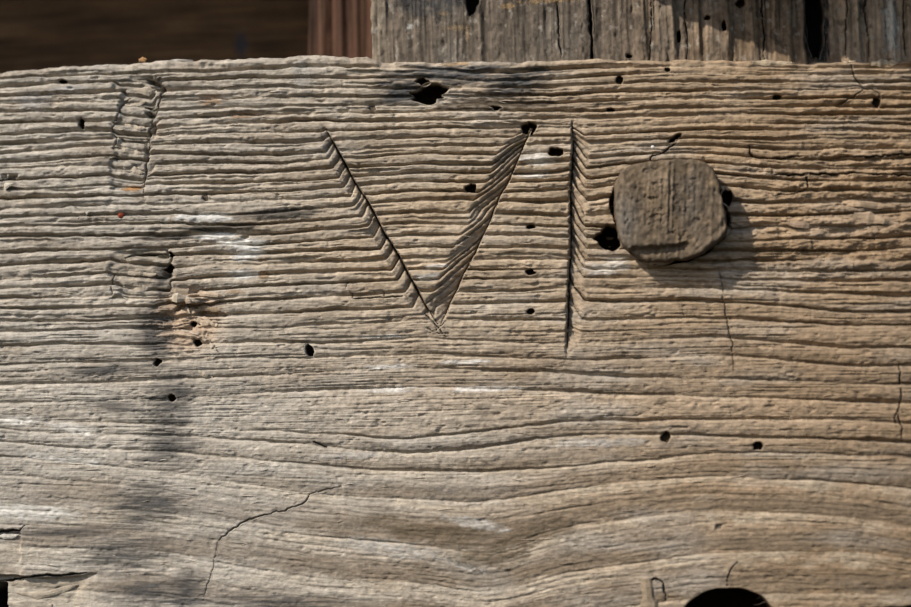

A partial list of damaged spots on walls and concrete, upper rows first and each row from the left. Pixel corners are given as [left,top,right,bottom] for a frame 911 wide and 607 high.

crack [555,2,563,58]
crack [587,0,595,59]
crack [647,0,655,60]
crack [835,0,882,107]
crack [900,0,908,58]
crack [717,267,735,371]
crack [893,363,904,442]
crack [203,486,342,600]